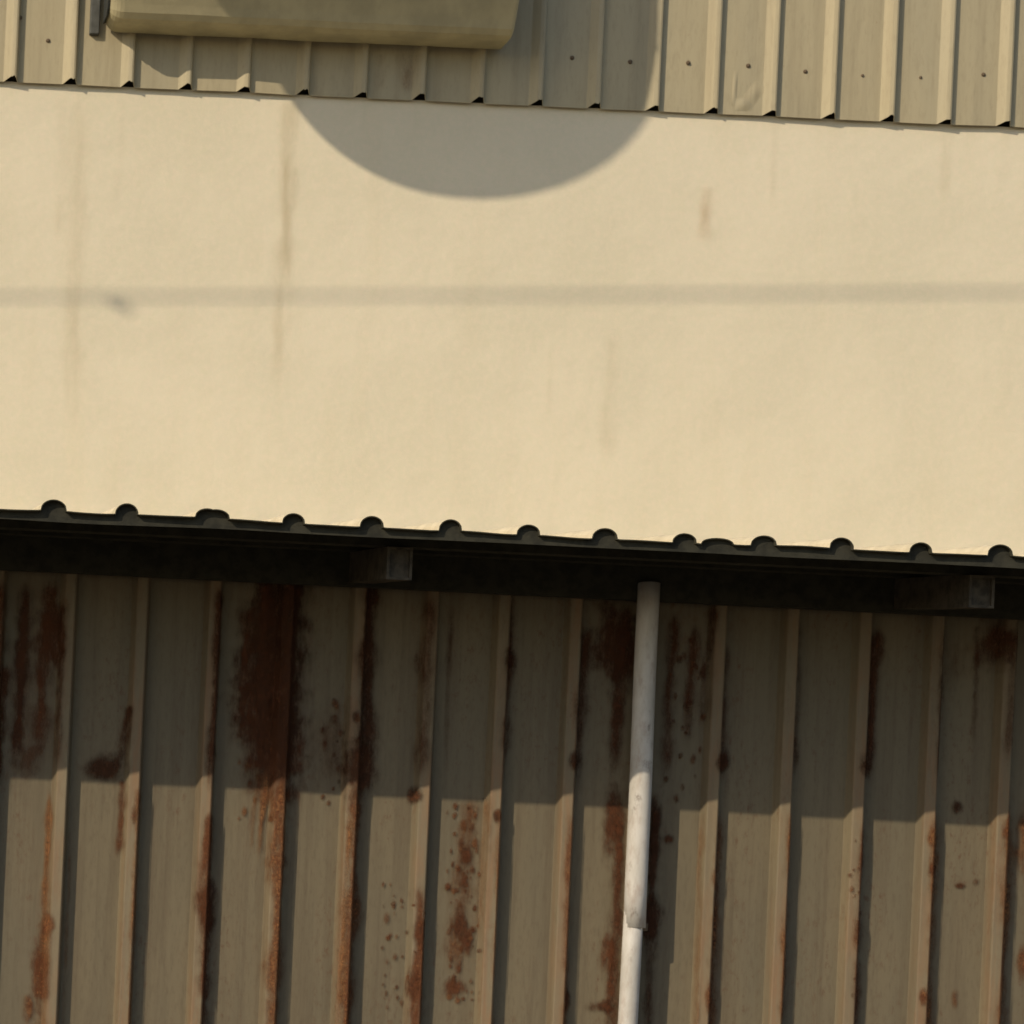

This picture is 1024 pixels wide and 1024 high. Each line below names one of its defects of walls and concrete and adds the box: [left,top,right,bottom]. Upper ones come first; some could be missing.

corrosion [0,586,65,773]
corrosion [206,591,223,778]
corrosion [569,601,635,769]
corrosion [25,797,53,1019]
corrosion [88,706,140,937]
corrosion [197,815,215,1024]
corrosion [233,583,307,1024]
corrosion [321,588,380,1024]
corrosion [445,803,501,1003]
corrosion [590,792,624,1024]
corrosion [643,797,673,1023]
corrosion [705,822,722,1024]